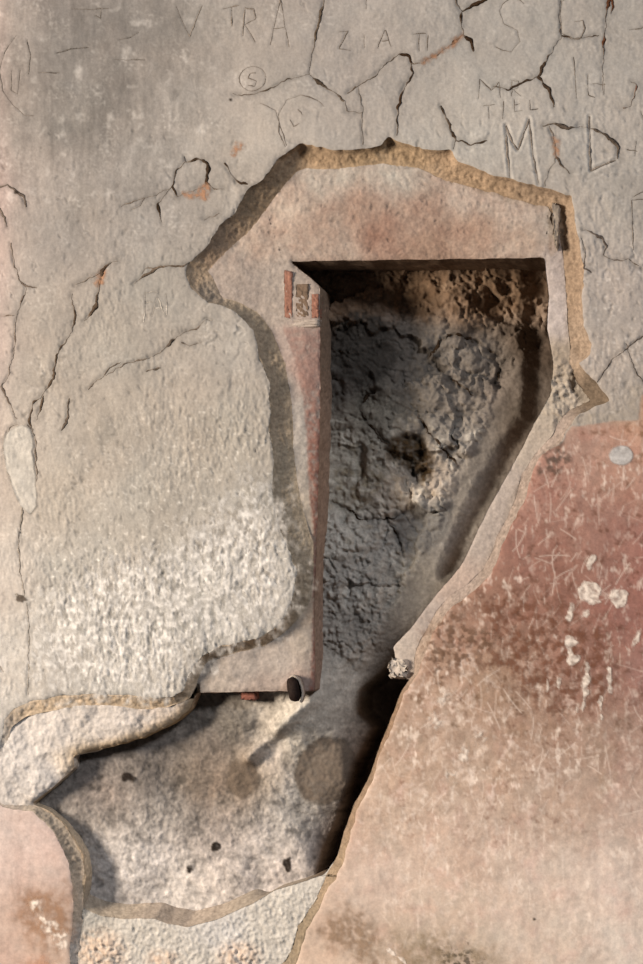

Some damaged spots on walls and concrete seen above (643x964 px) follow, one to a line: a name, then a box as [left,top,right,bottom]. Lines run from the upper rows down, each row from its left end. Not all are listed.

crack [233,0,487,148]
crack [493,0,620,183]
crack [121,158,248,219]
crack [549,205,637,272]
crack [0,184,210,483]
crack [425,333,506,396]
crack [597,336,643,382]
flaking render [186,137,609,878]
crack [417,413,458,467]
crack [16,507,32,694]
spalling [1,804,336,964]
damp [329,918,374,957]